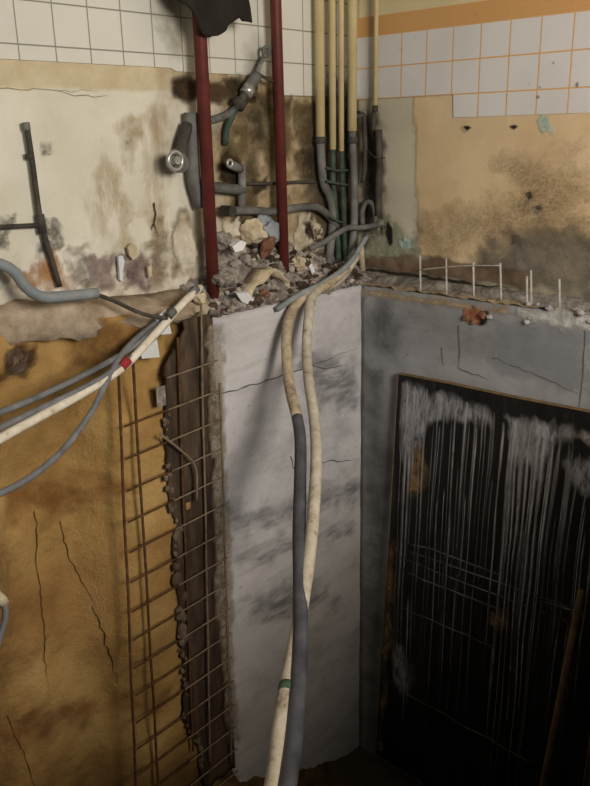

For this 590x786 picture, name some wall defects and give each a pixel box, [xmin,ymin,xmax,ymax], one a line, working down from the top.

peeling [173,213,197,271]
spalling [220,153,240,184]
peeling [365,95,590,291]
leakage [478,228,590,299]
crack [217,352,346,394]
crack [493,329,586,406]
leakage [398,440,439,510]
leakage [449,408,491,512]
spalling [117,304,237,786]
leakage [490,433,559,633]
crack [34,511,50,696]
crack [60,521,119,686]